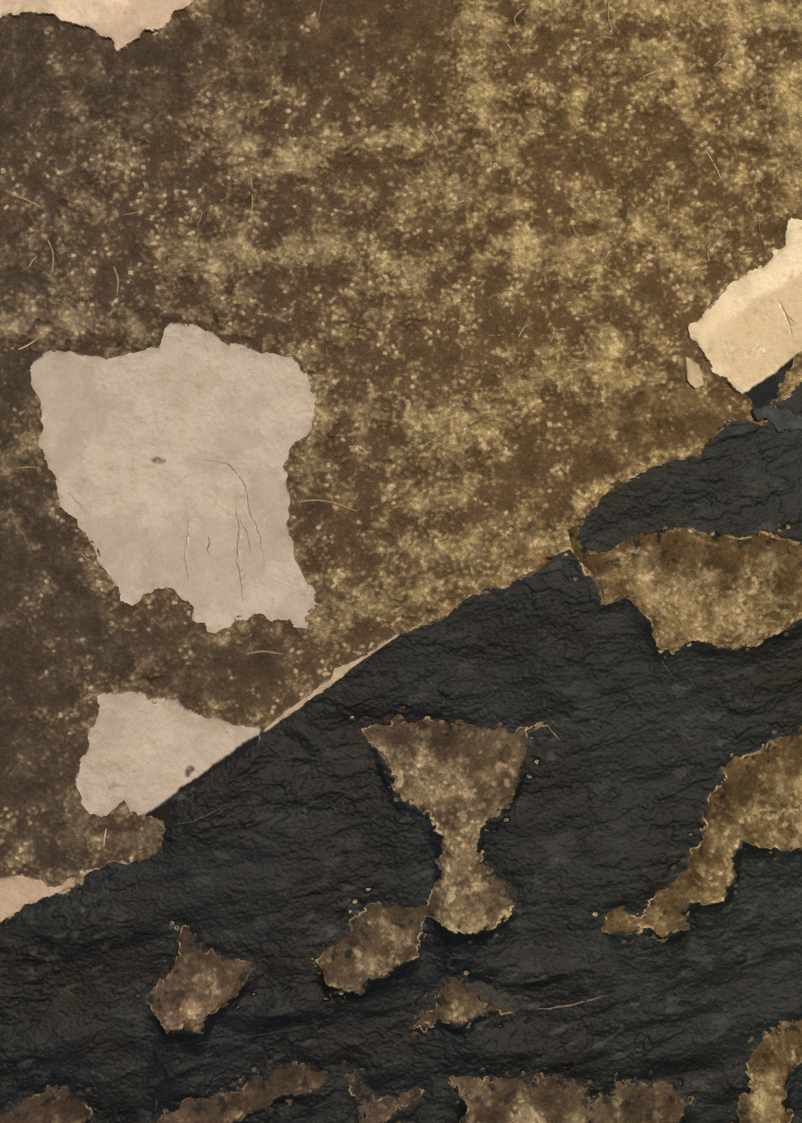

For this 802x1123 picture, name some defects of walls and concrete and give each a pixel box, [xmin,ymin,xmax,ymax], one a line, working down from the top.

spalling [0,0,802,895]
spalling [311,706,555,1000]
spalling [593,724,802,943]
spalling [136,921,255,1034]
spalling [0,1084,93,1123]
spalling [157,1058,328,1123]
spalling [345,1068,425,1123]
spalling [447,1067,694,1123]
spalling [731,1020,802,1123]